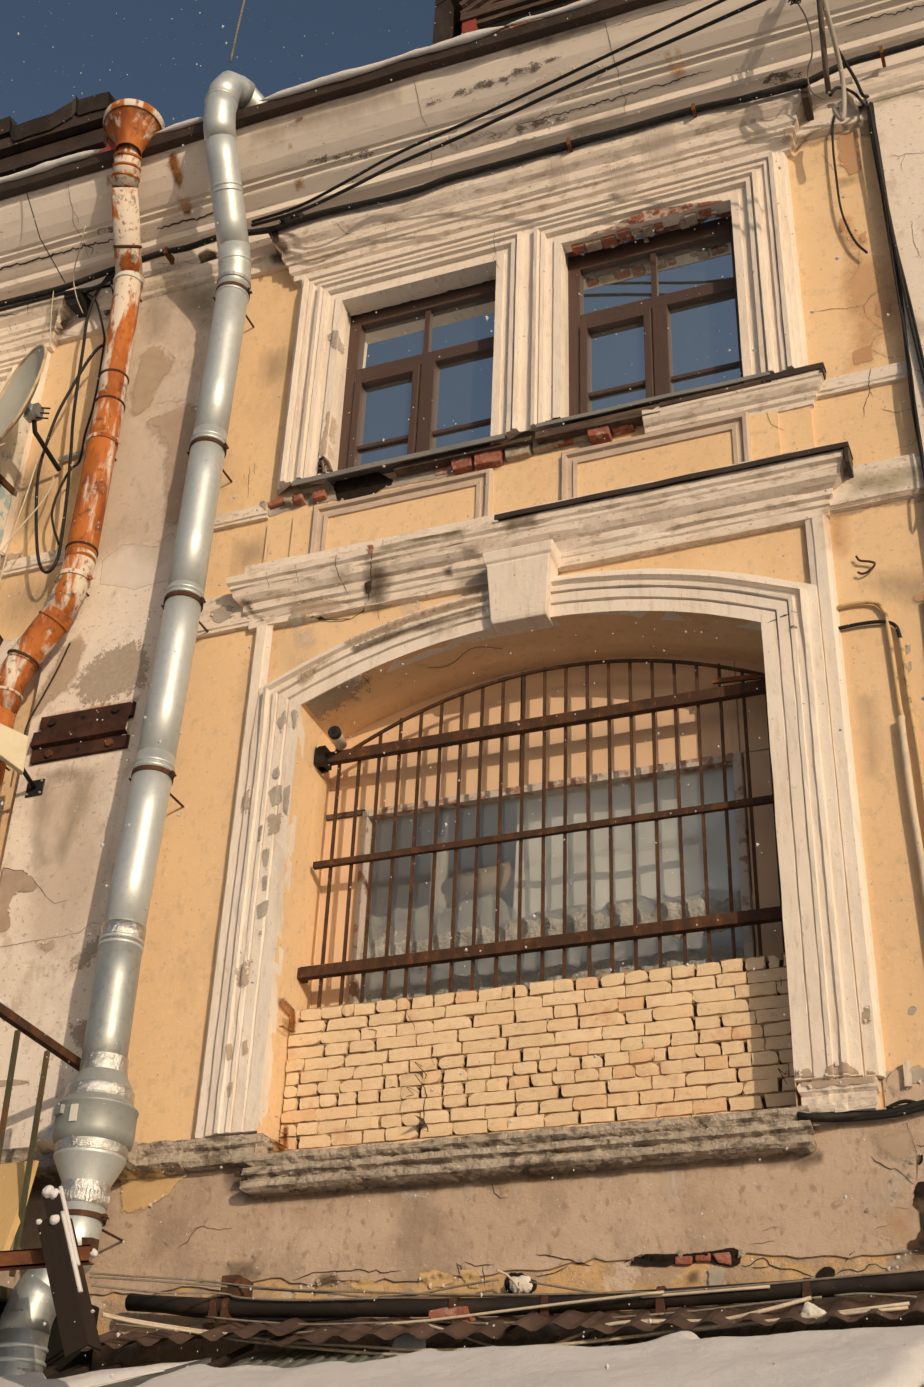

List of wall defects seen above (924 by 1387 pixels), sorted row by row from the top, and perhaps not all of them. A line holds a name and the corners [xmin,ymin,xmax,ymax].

corrosion [169,153,190,214]
spalling [580,200,722,255]
flaking render [260,411,644,516]
damp [370,566,387,600]
peeling [33,637,150,715]
flaking render [0,869,37,932]
crack [295,1269,401,1285]
crack [456,1262,489,1288]
crack [536,1254,591,1277]
flaking render [628,1248,746,1286]